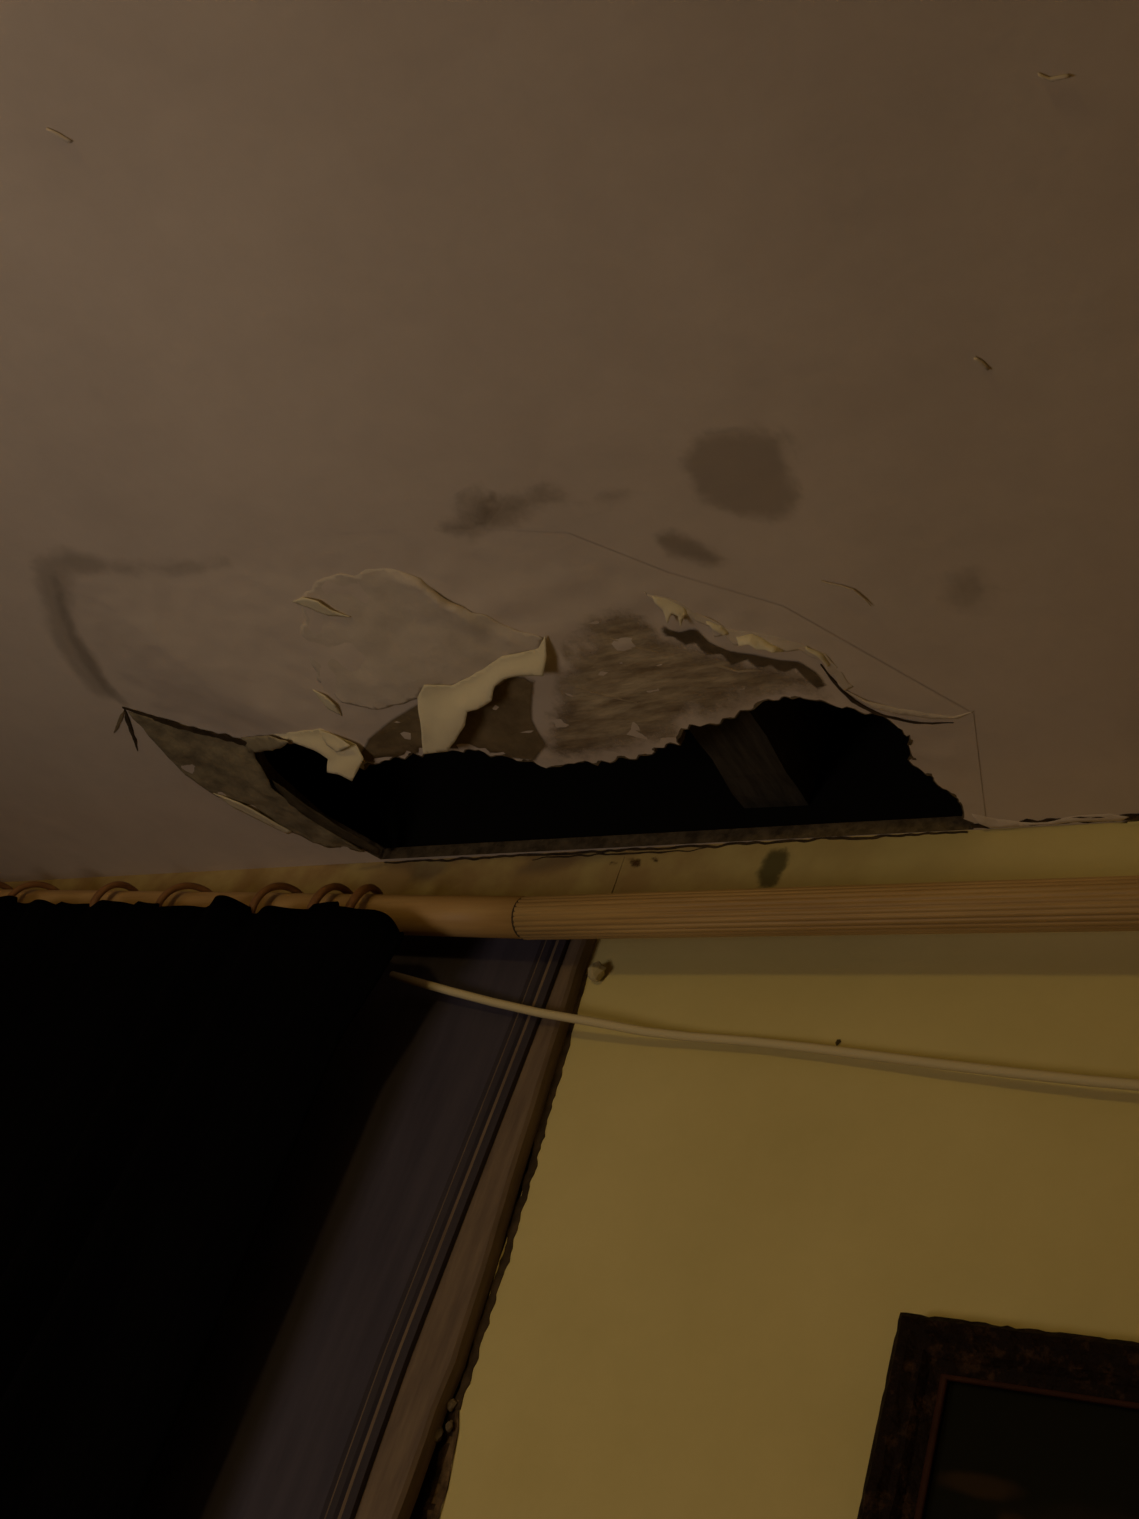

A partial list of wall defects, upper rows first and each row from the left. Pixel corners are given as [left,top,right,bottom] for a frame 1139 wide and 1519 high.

peeling [270,568,974,781]